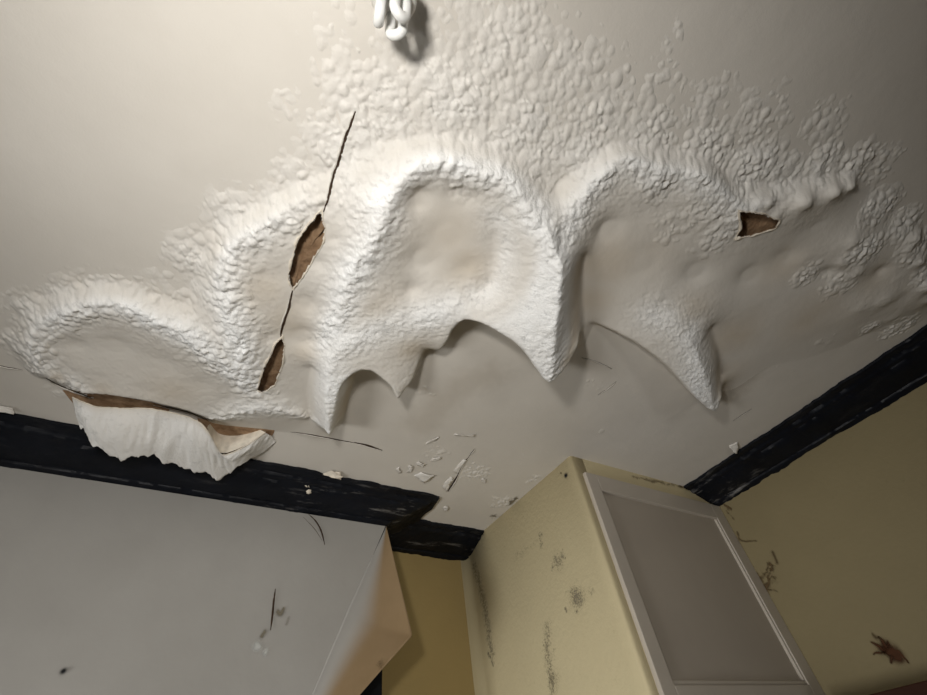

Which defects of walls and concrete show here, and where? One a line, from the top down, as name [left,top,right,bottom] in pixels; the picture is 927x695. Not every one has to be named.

crack [323,111,356,212]
crack [279,290,293,341]
peeling [72,397,276,481]